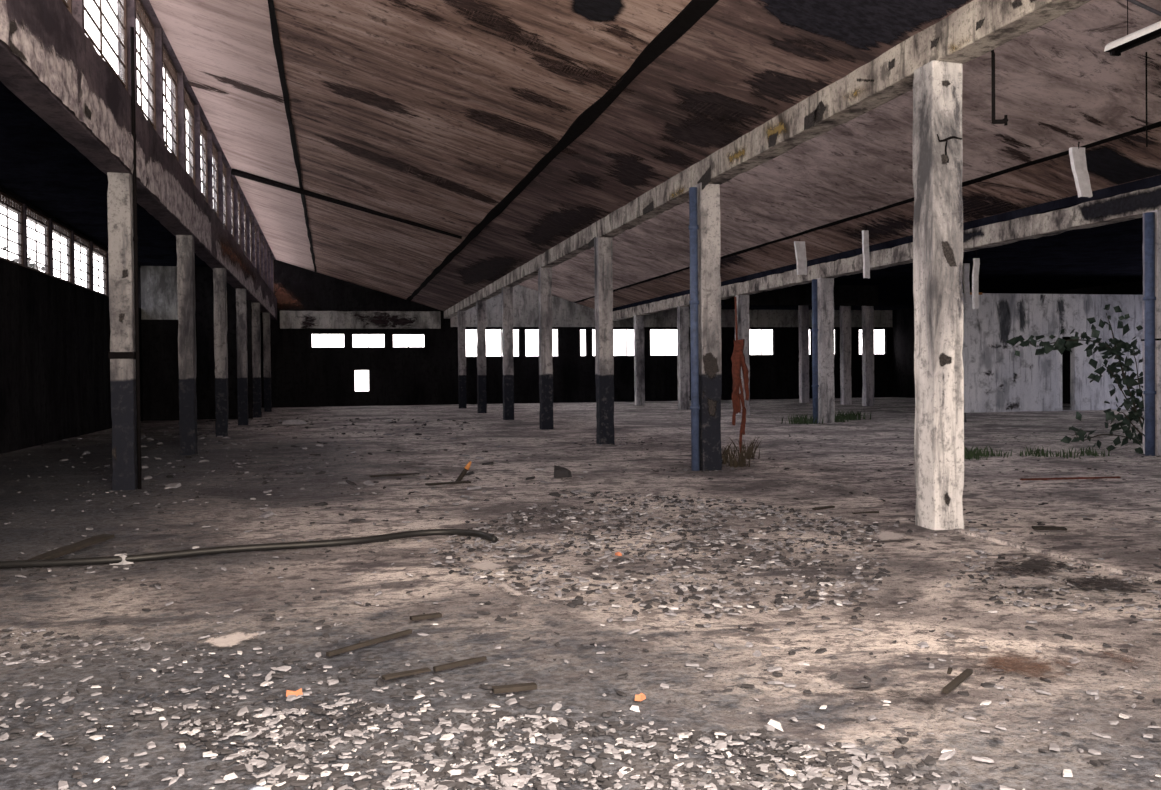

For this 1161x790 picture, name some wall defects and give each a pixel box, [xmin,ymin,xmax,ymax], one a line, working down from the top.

damp [572,0,649,44]
damp [389,0,634,93]
damp [187,72,291,105]
damp [321,80,423,119]
damp [508,86,572,112]
damp [952,86,960,126]
damp [462,108,579,156]
flaking render [0,0,300,317]
damp [315,134,500,205]